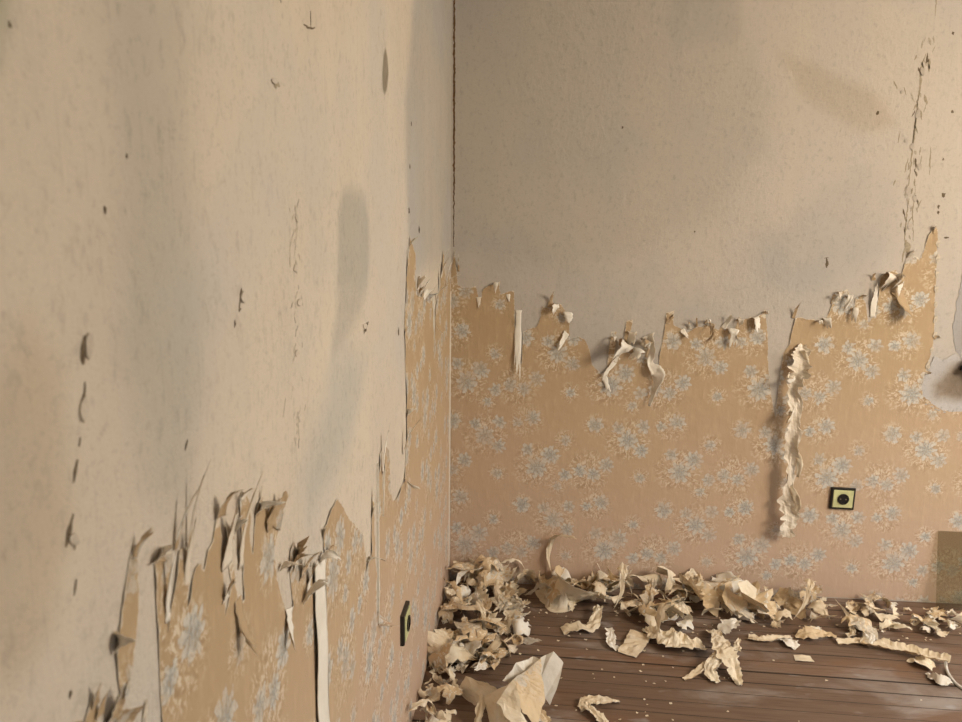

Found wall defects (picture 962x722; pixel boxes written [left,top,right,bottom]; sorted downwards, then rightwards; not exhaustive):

crack [893,36,936,262]